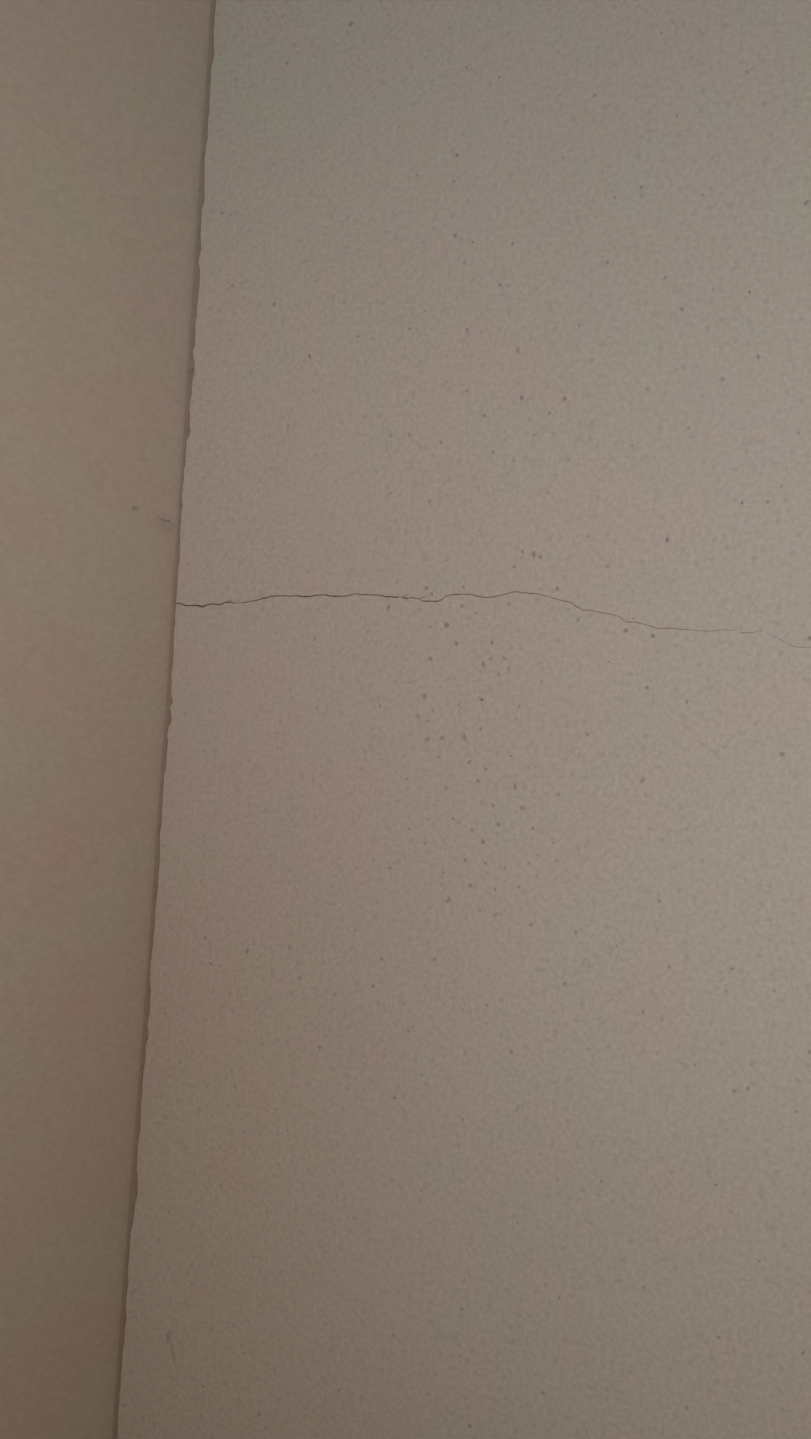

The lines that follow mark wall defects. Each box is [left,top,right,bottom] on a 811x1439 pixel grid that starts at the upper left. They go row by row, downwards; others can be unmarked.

crack [112,0,737,1439]